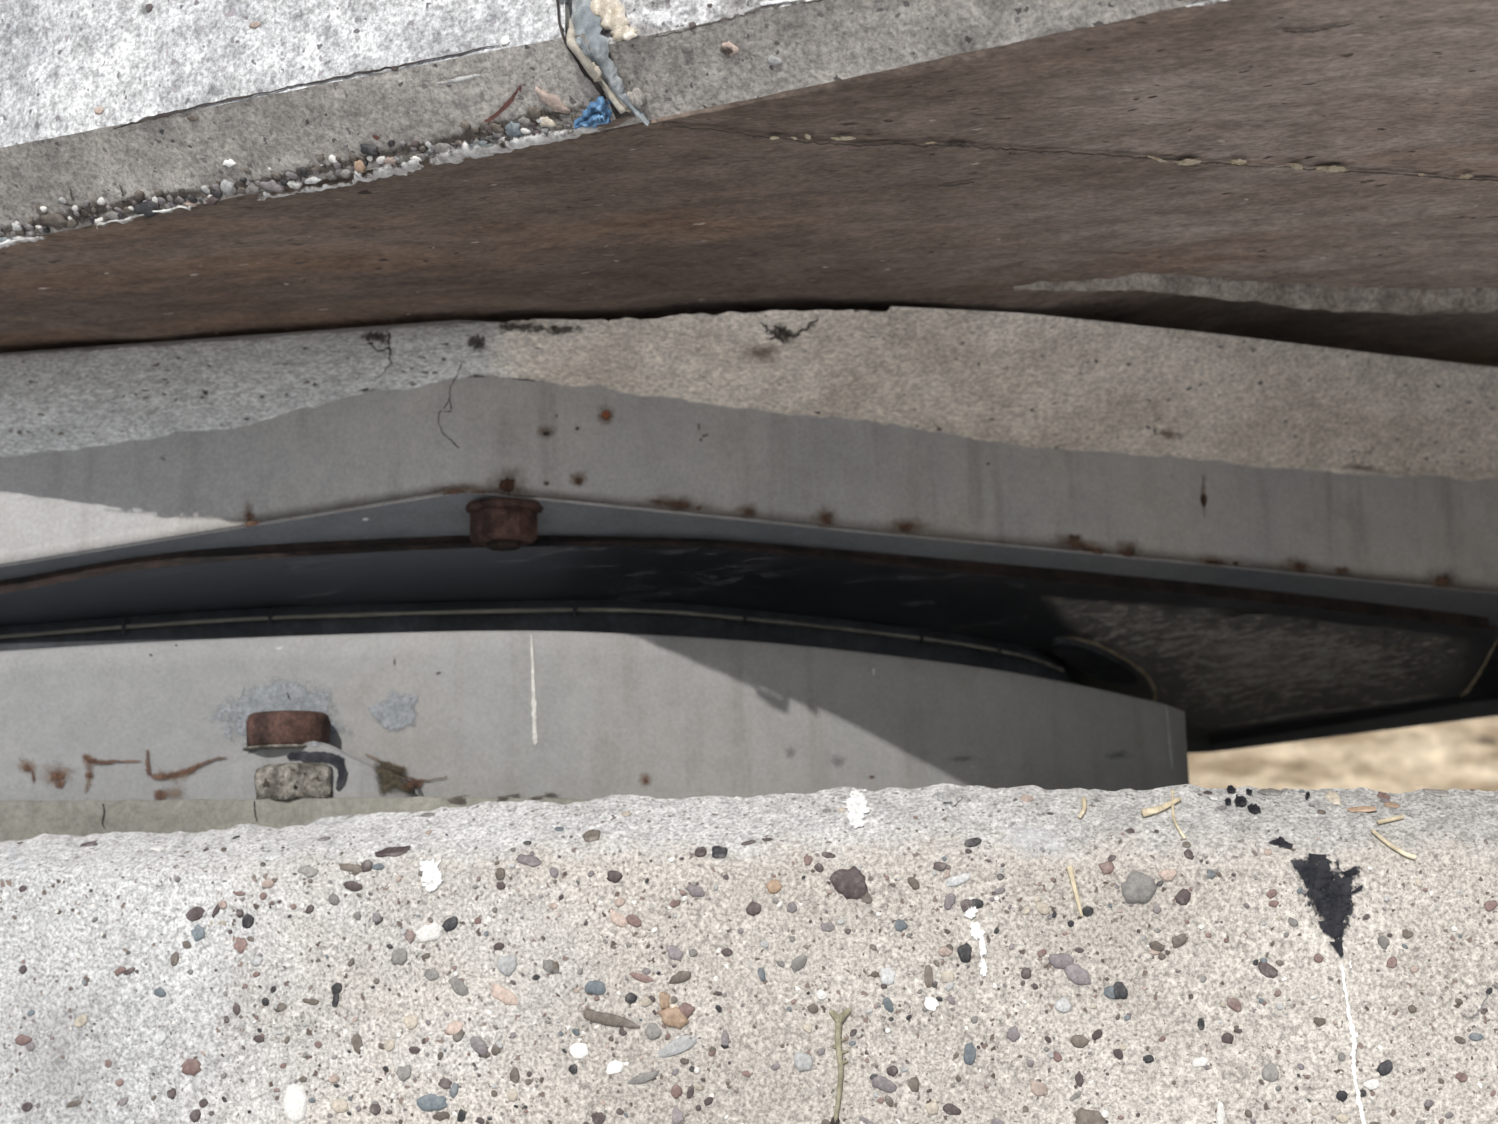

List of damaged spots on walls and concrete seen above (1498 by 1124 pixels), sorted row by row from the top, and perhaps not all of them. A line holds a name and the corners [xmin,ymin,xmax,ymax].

crack [656,119,1498,181]
rust [21,749,227,800]
efflorescence [1340,961,1366,1124]